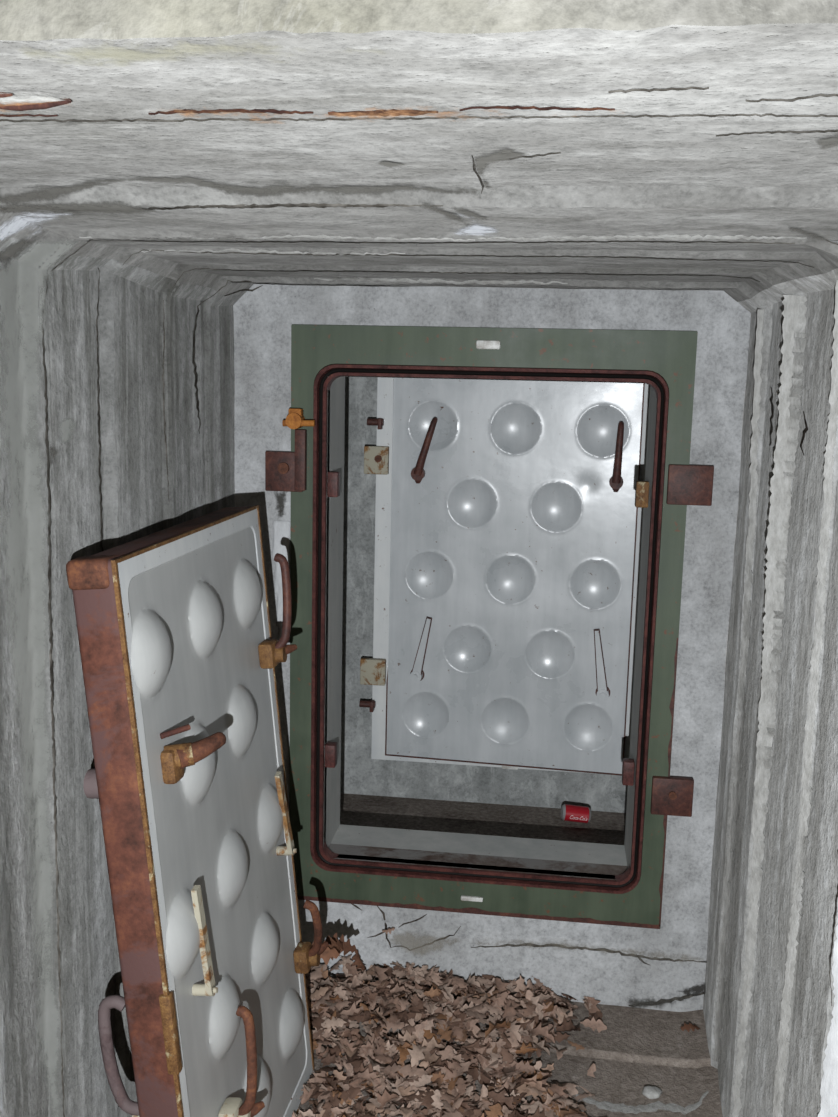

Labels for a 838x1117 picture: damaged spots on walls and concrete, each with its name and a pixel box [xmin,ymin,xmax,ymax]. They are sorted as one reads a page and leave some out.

crack [0,87,838,137]
crack [472,156,484,194]
crack [509,152,561,160]
damp [817,136,838,150]
crack [42,239,814,1117]